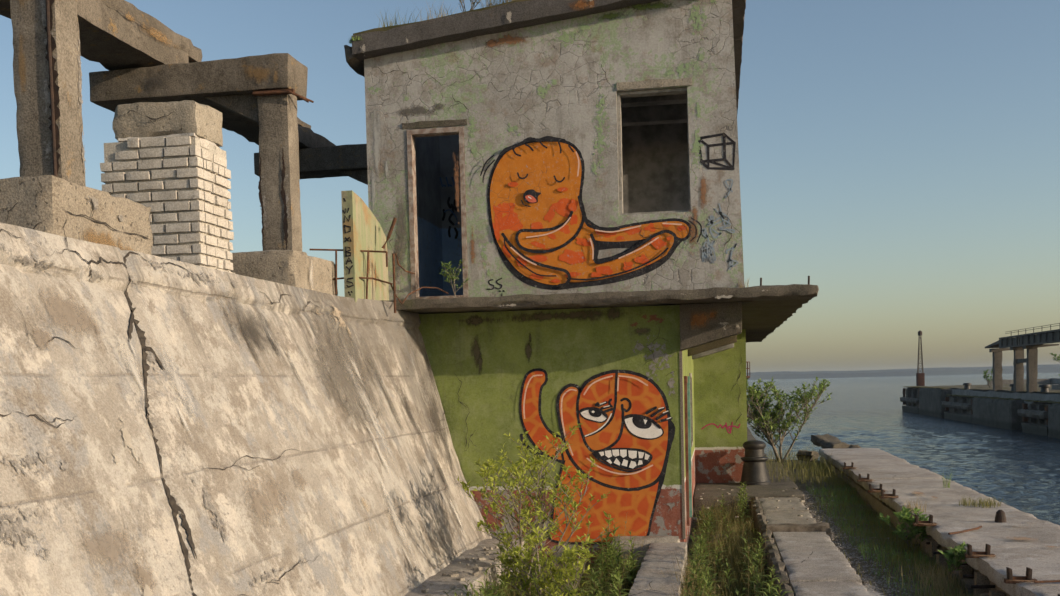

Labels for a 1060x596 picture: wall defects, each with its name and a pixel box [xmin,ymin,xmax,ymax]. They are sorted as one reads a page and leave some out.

rust [486,34,526,47]
crack [0,202,330,596]